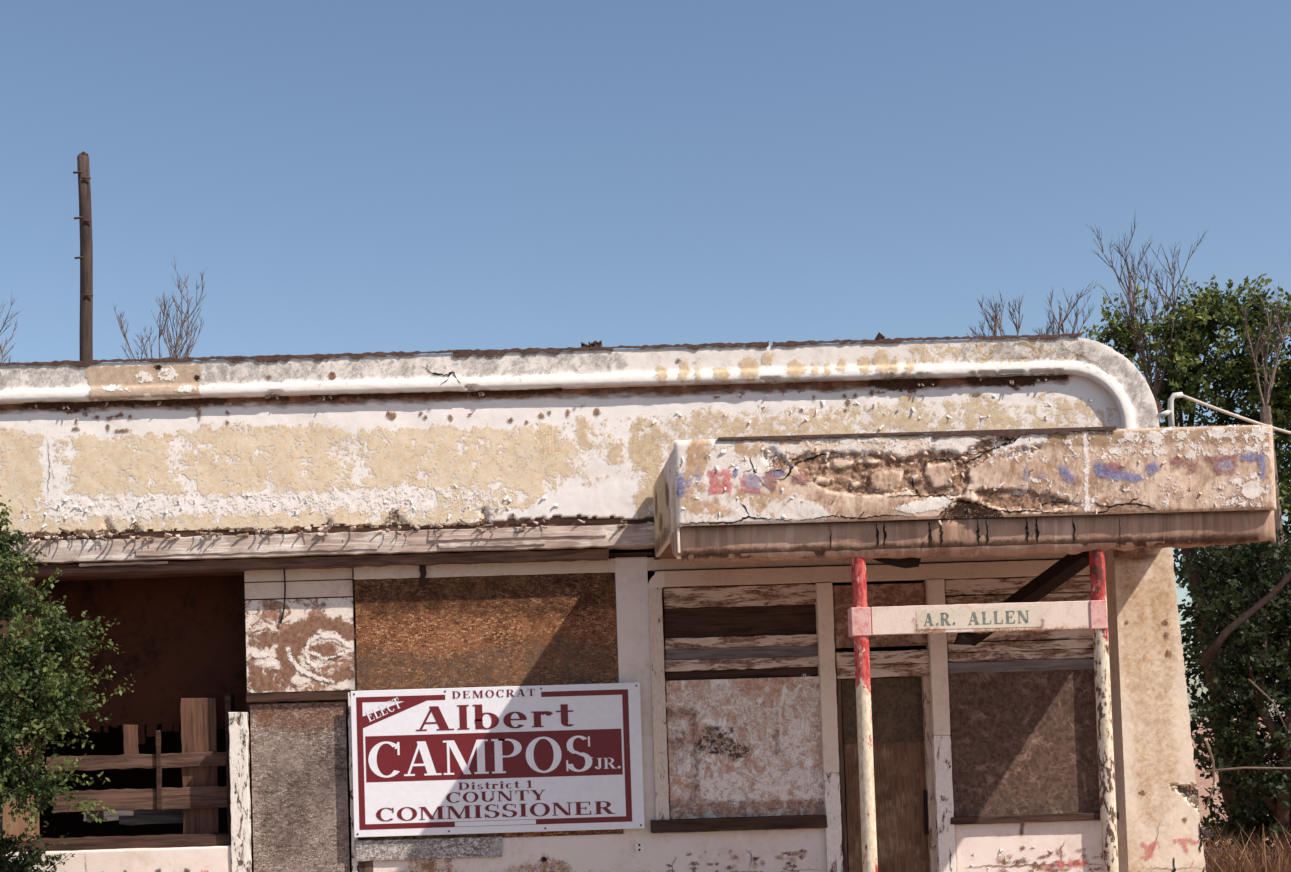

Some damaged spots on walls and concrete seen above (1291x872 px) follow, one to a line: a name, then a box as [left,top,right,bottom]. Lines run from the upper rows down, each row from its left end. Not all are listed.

peeling [0,363,1271,556]
crack [679,435,1156,525]
peeling [247,615,356,693]
spalling [1172,782,1217,813]
crack [1149,821,1205,872]